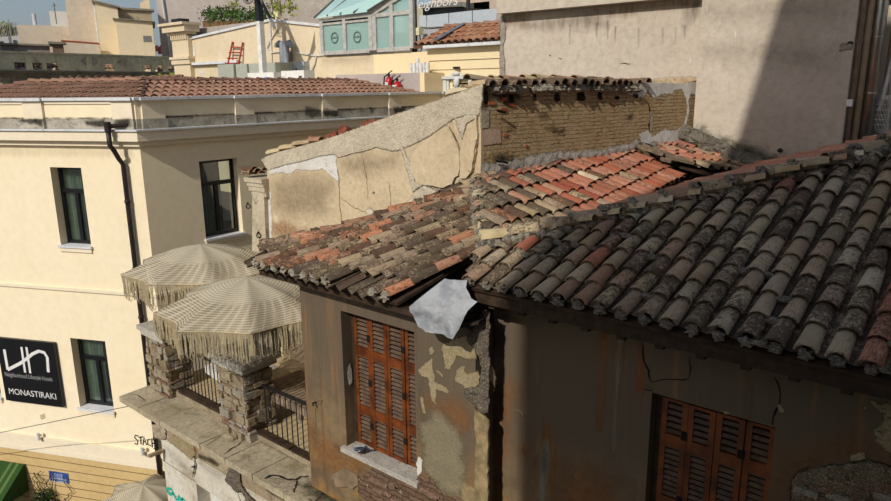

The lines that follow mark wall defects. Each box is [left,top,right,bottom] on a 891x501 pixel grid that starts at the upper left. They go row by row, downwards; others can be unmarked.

leakage [2,117,129,126]
leakage [255,106,417,118]
spalling [239,84,483,203]
peeling [623,82,696,143]
crack [641,342,691,391]
peeling [332,310,491,501]
peeling [870,400,891,453]